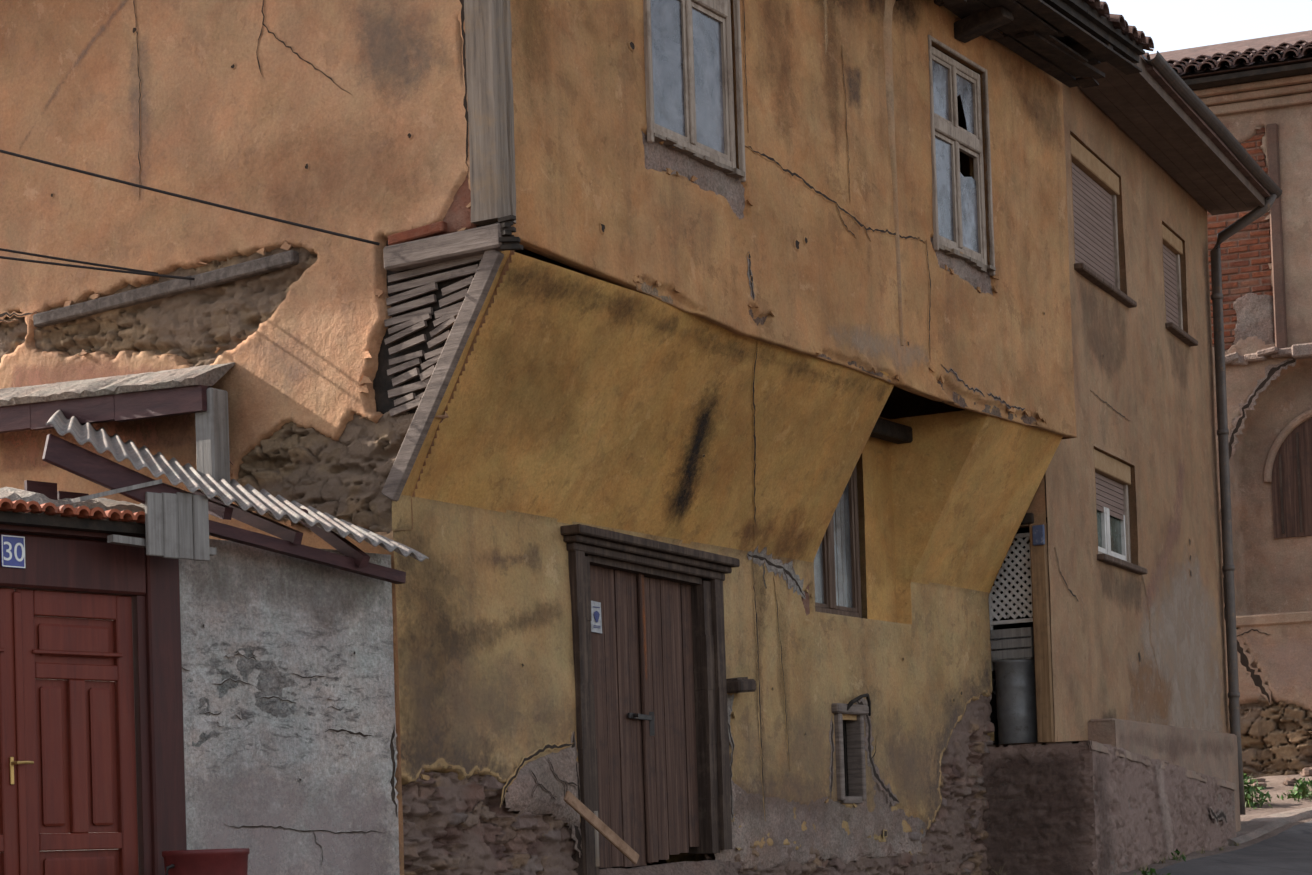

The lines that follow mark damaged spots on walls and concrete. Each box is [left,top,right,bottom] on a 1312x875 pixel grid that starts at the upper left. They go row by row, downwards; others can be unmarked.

crack [133,0,142,198]
crack [256,0,352,95]
flaking render [641,131,753,219]
crack [742,0,1025,411]
spalling [929,364,1047,426]
crack [728,340,806,824]
crack [1220,509,1271,705]
crack [224,724,398,867]
crack [829,698,899,807]